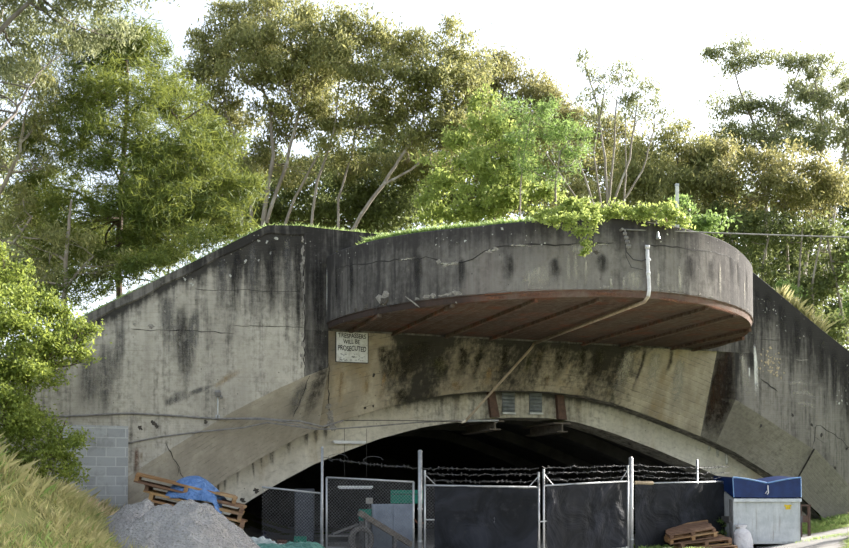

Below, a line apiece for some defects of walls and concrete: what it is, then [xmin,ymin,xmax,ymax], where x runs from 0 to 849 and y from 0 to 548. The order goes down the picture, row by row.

crack [340,242,611,268]
crack [648,244,736,261]
water stain [82,332,123,404]
water stain [164,300,197,369]
water stain [459,348,483,374]
water stain [705,347,758,423]